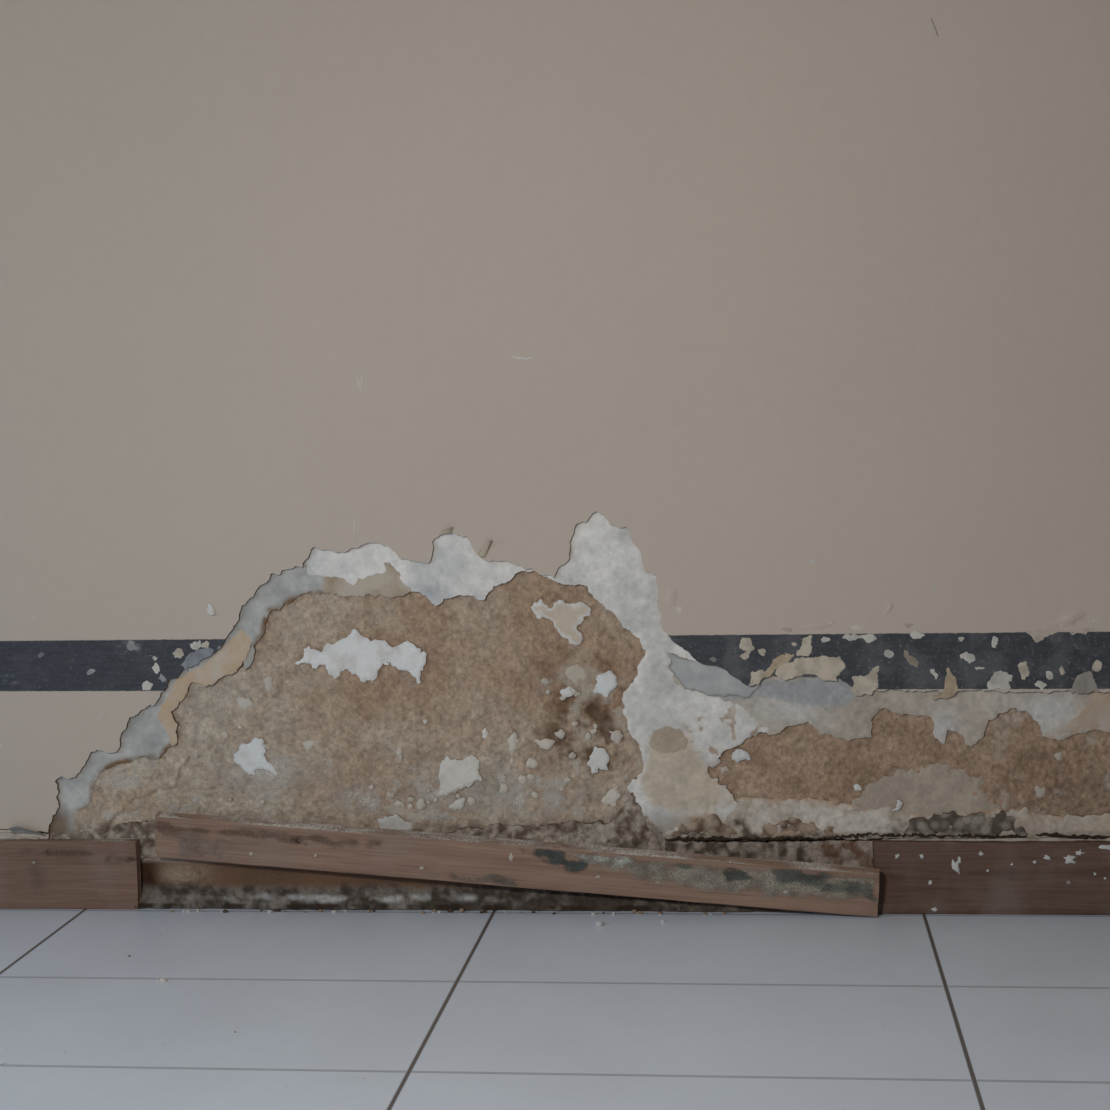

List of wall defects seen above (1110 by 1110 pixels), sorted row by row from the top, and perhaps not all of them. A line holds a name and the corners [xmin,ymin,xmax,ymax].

spalling [9,512,1110,912]